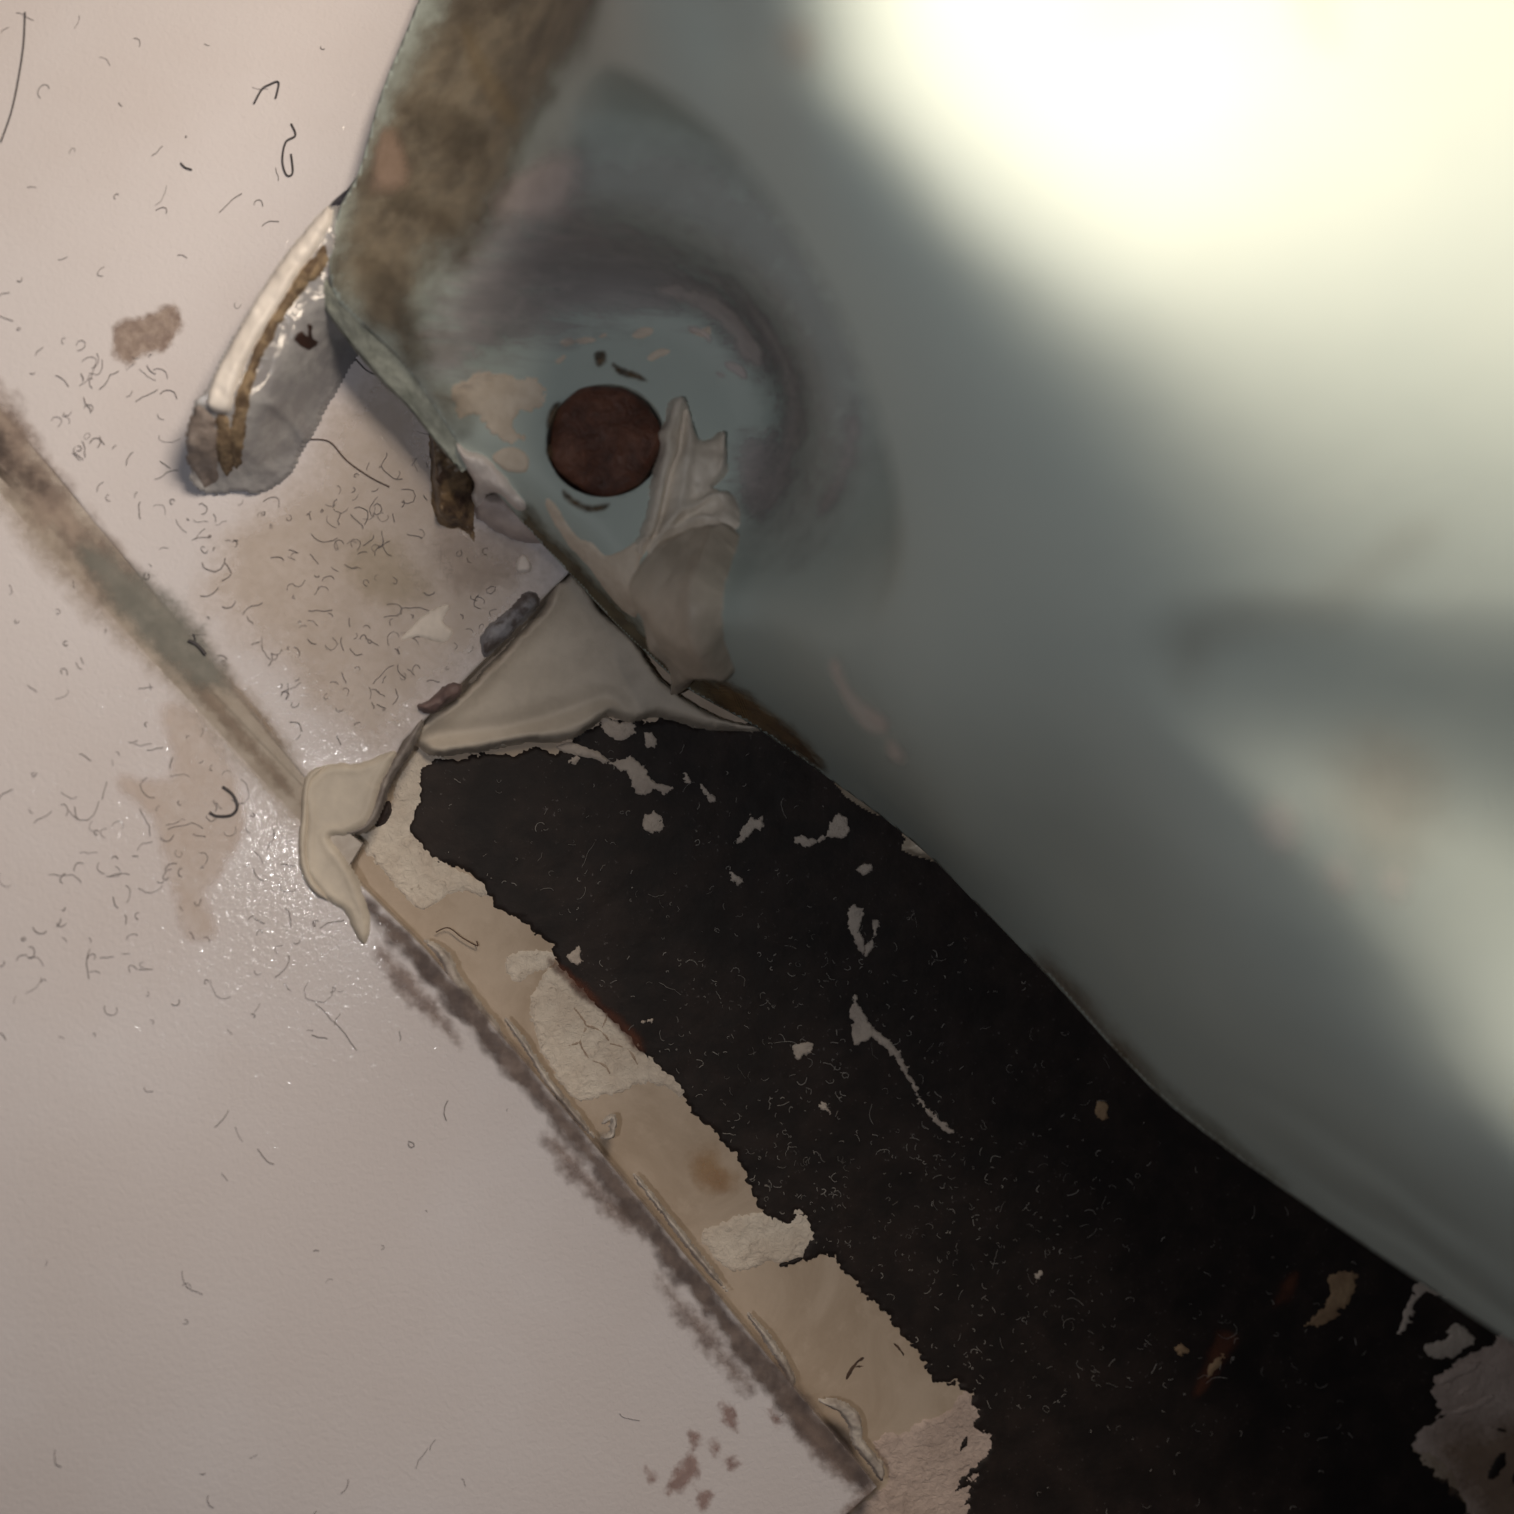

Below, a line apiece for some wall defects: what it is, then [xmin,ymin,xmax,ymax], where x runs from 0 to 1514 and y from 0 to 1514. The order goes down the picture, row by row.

rust [595,352,644,380]
rust [563,491,607,511]
peeling [480,555,540,657]
leakage [83,548,289,792]
peeling [417,682,462,714]
peeling [600,717,717,834]
peeling [375,801,392,827]
peeling [794,813,850,848]
peeling [847,904,880,957]
peeling [566,946,582,966]
peeling [849,994,954,1134]
peeling [1424,1323,1476,1359]